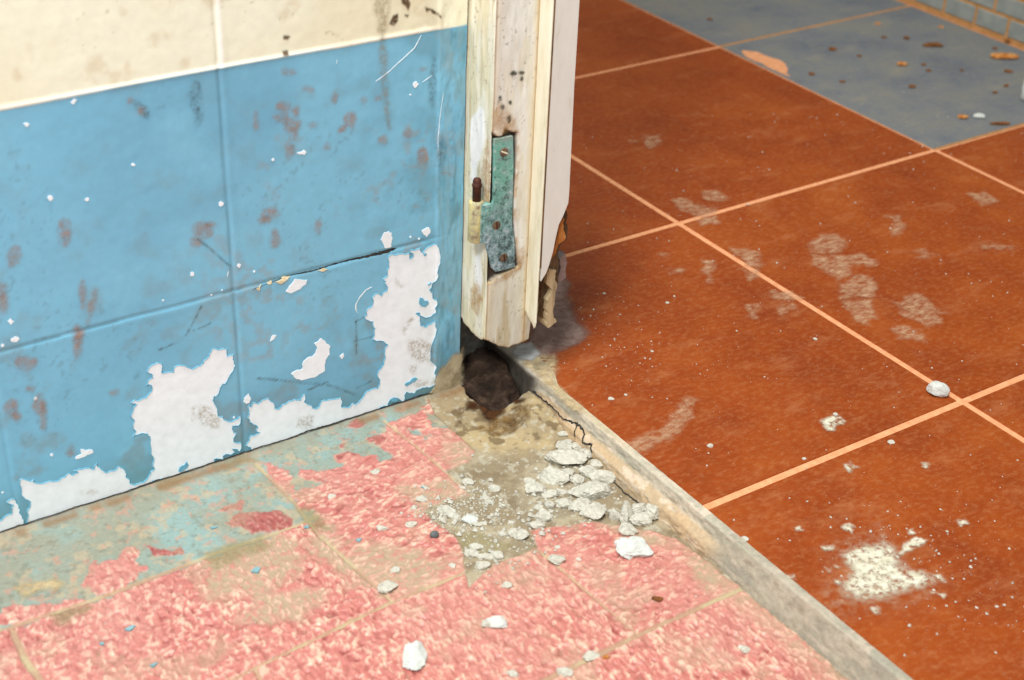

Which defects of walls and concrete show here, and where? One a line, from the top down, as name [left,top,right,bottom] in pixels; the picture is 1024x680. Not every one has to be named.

crack [253,248,396,291]
damp [814,255,876,323]
peeling [0,227,464,531]
crack [532,390,593,453]